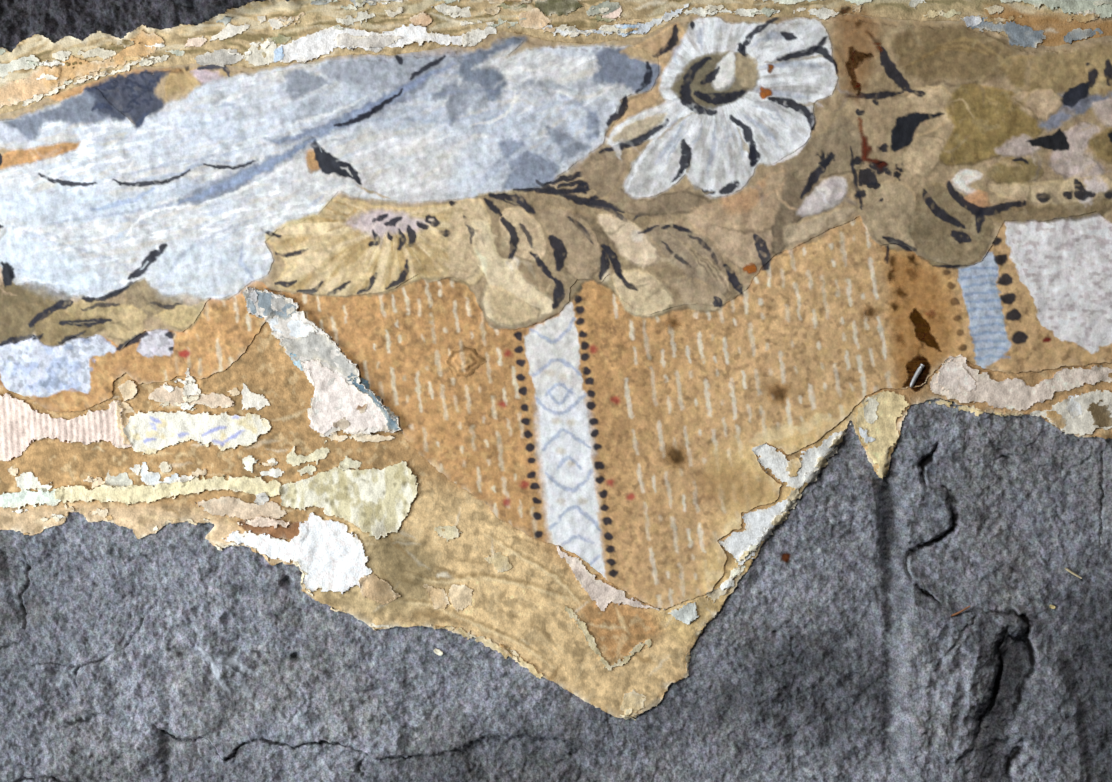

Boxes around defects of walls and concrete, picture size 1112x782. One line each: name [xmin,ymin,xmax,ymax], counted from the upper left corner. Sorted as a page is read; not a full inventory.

peeling [0,0,872,108]
peeling [909,0,1112,48]
peeling [0,287,419,605]
crack [920,450,934,482]
crack [906,496,957,562]
crack [979,610,1035,728]
crack [215,739,341,760]
crack [1006,746,1023,778]